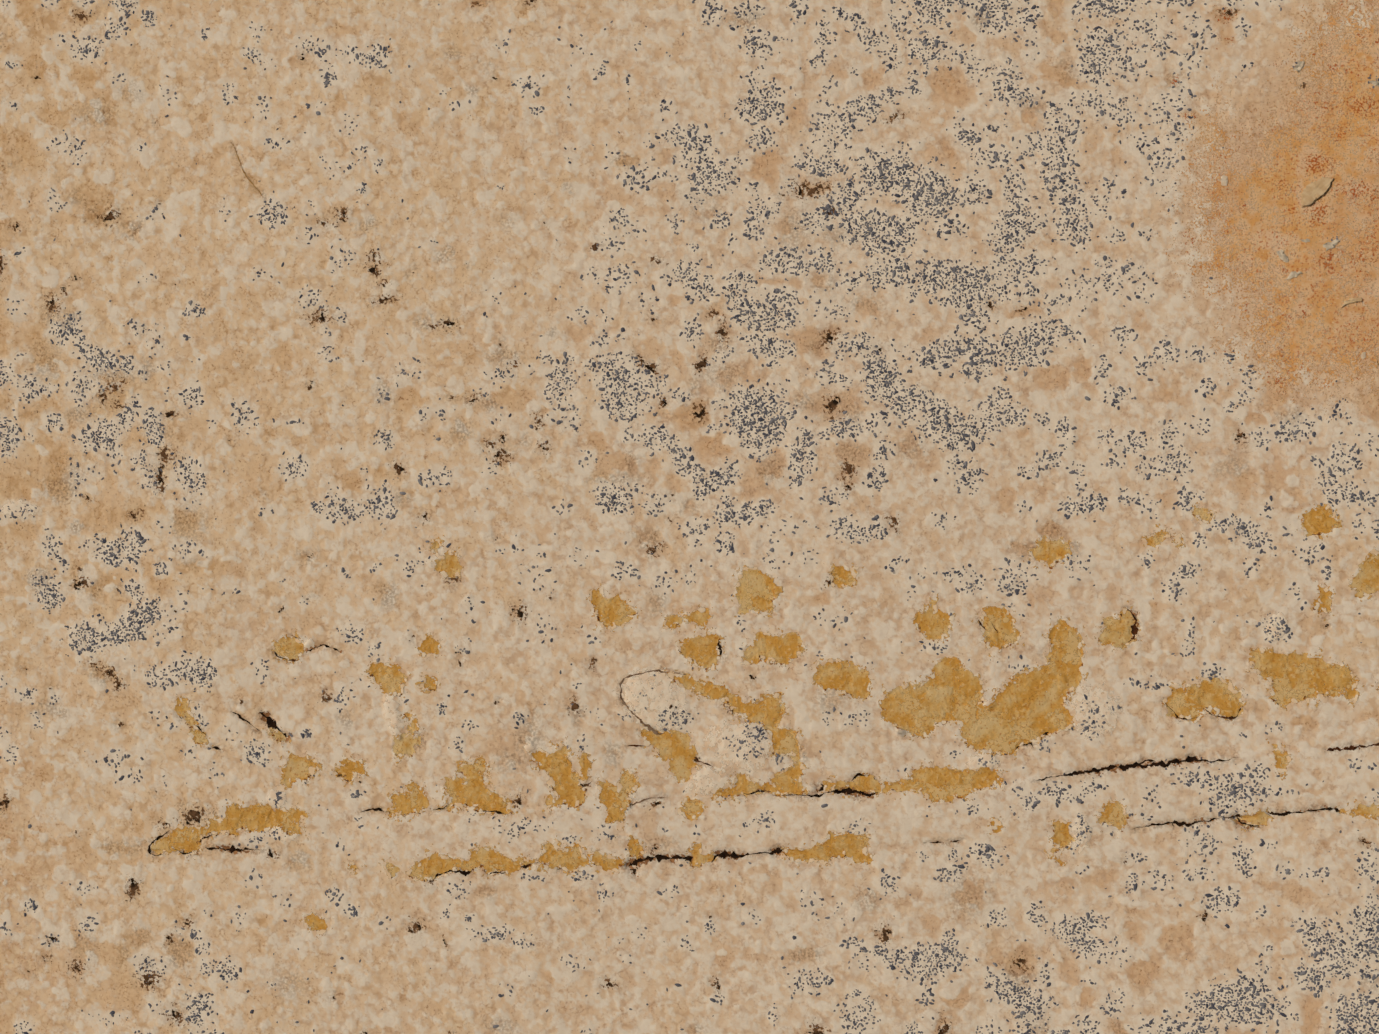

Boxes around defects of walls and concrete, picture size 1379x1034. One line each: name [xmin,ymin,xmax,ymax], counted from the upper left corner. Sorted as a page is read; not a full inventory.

corrosion [1160,0,1379,420]
spalling [640,563,1142,822]
spalling [1161,647,1379,723]
spalling [145,799,309,862]
crack [233,710,292,742]
spalling [262,725,369,790]
spalling [344,736,647,883]
crack [626,846,783,877]
crack [744,773,878,801]
spalling [781,831,874,869]
crack [1036,756,1236,781]
crack [1134,805,1340,830]